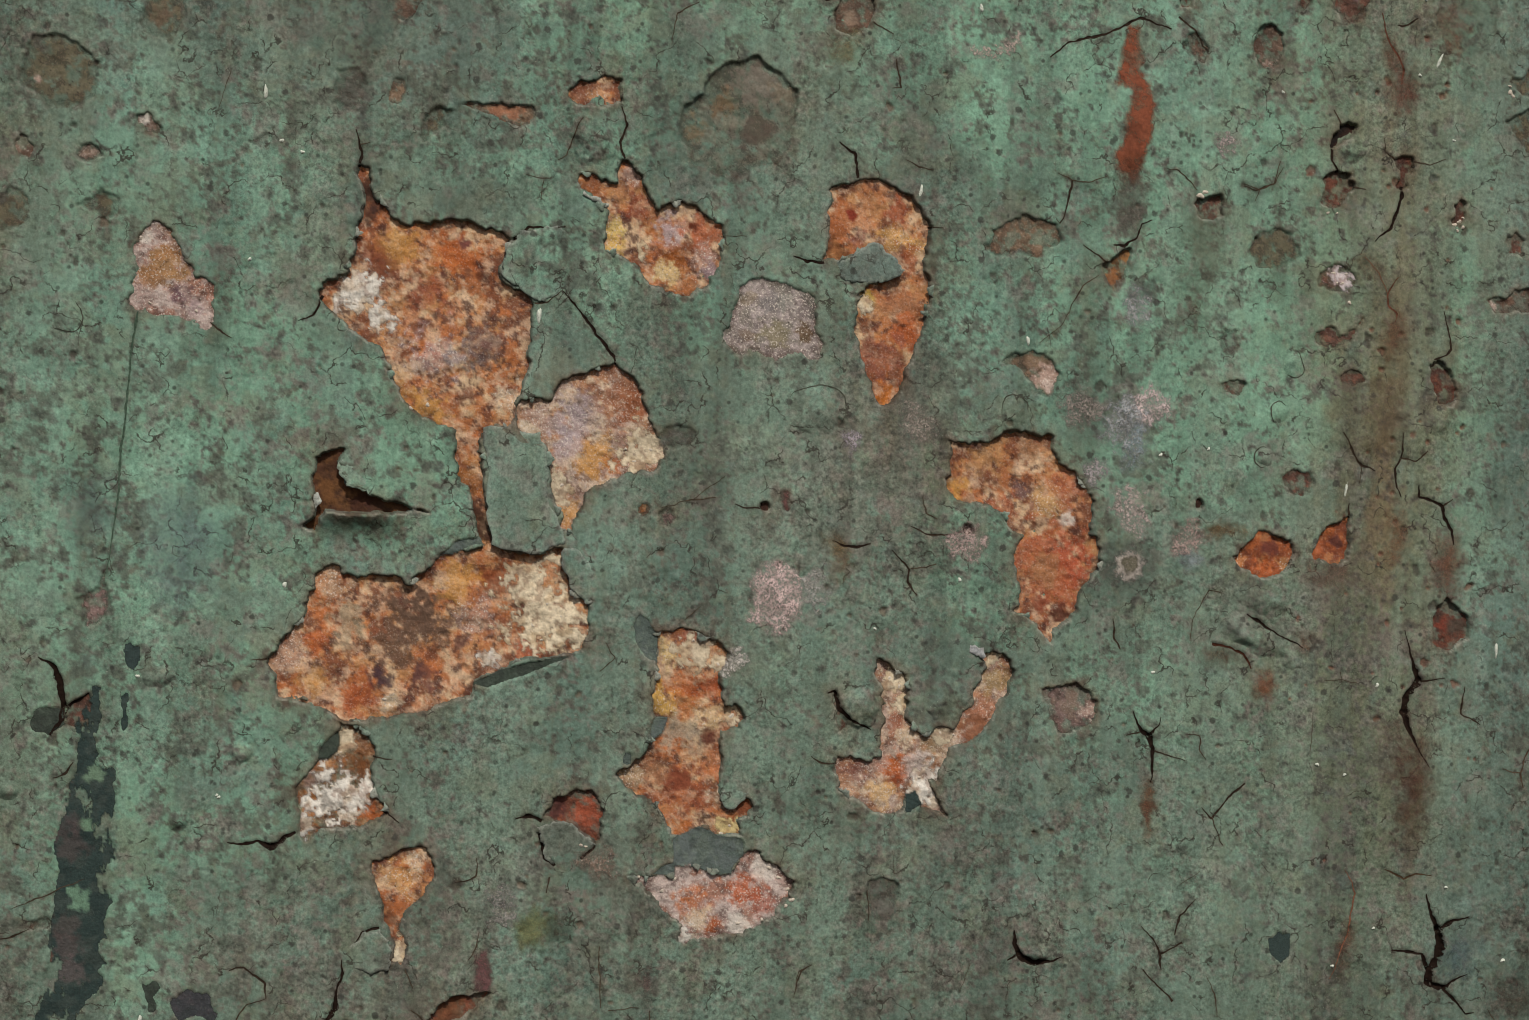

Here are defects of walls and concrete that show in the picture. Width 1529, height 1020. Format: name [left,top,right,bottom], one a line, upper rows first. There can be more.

peeling [128,221,214,330]
peeling [578,162,726,296]
peeling [823,179,934,405]
rust [1116,26,1155,230]
peeling [268,166,694,842]
peeling [945,432,1104,642]
leakage [35,685,116,1020]
leakage [121,693,129,731]
peeling [617,614,795,944]
peeling [835,645,1012,814]
crack [1329,869,1494,1020]
crack [1399,631,1480,768]